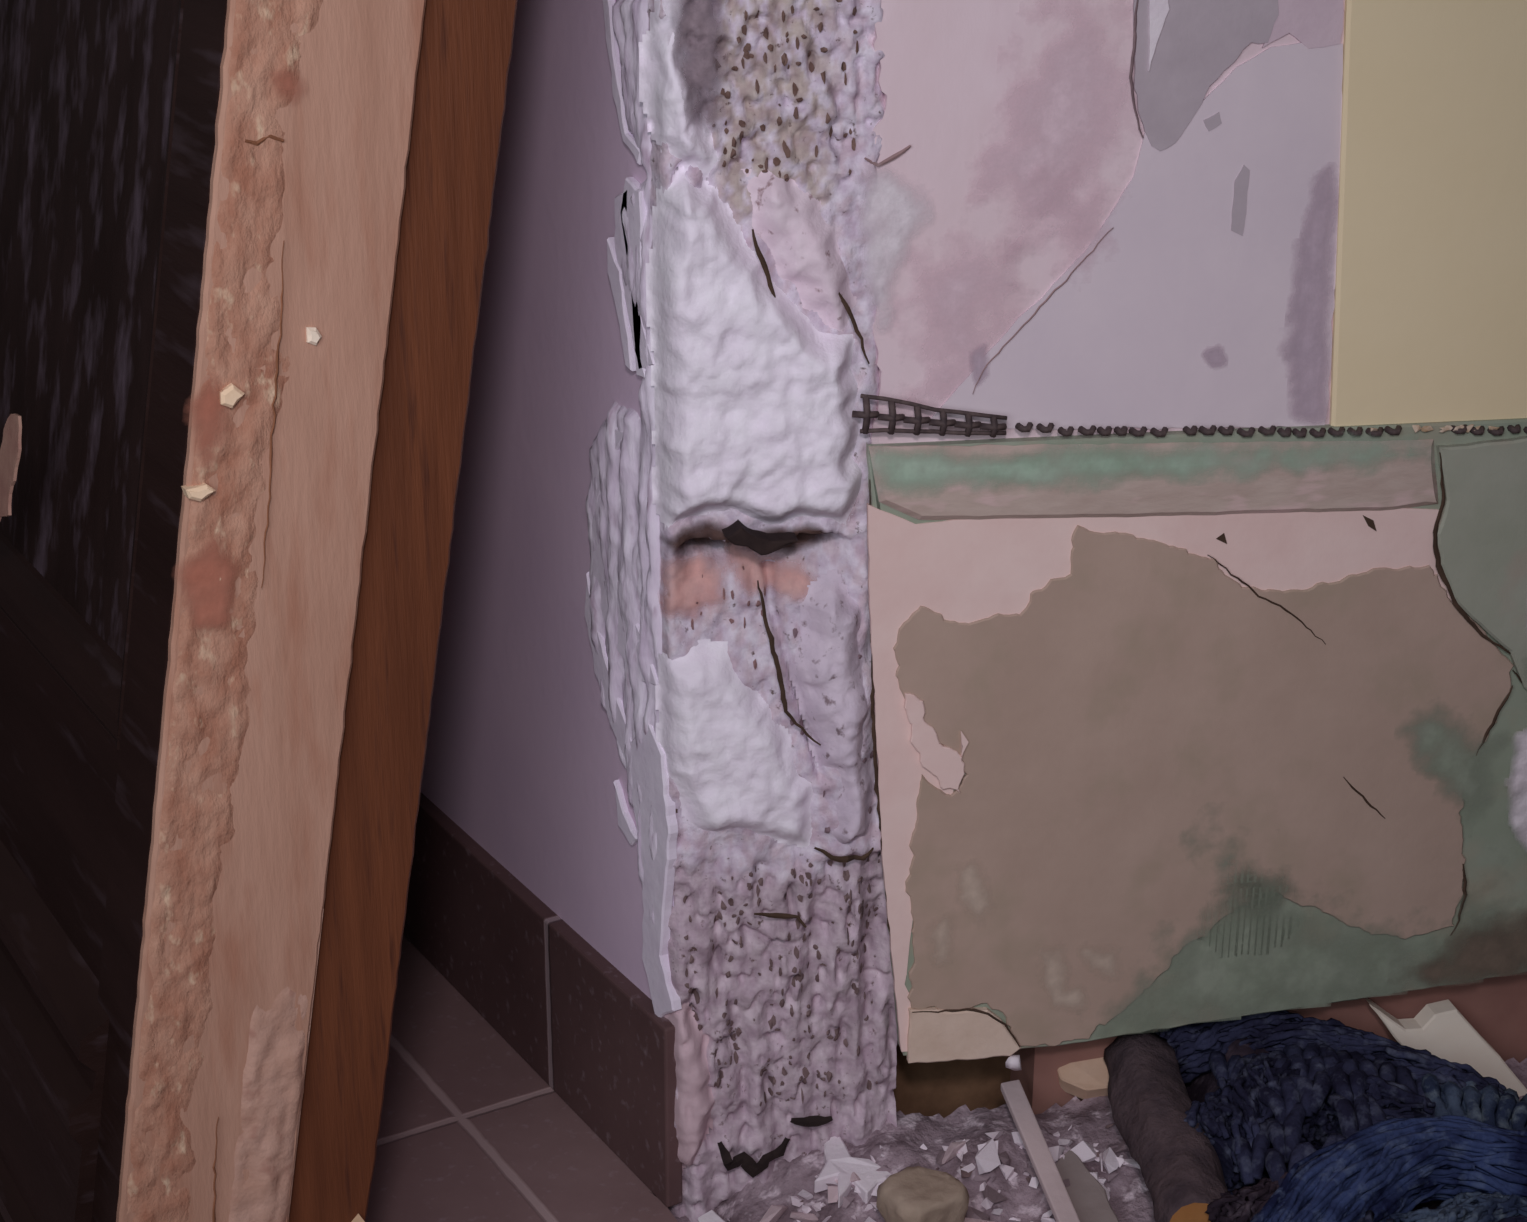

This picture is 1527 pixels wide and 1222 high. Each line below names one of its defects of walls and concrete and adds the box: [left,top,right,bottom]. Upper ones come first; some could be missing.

crack [757,580,821,746]
peeling [585,0,1527,1222]
crack [1476,670,1522,756]
crack [1450,864,1467,935]